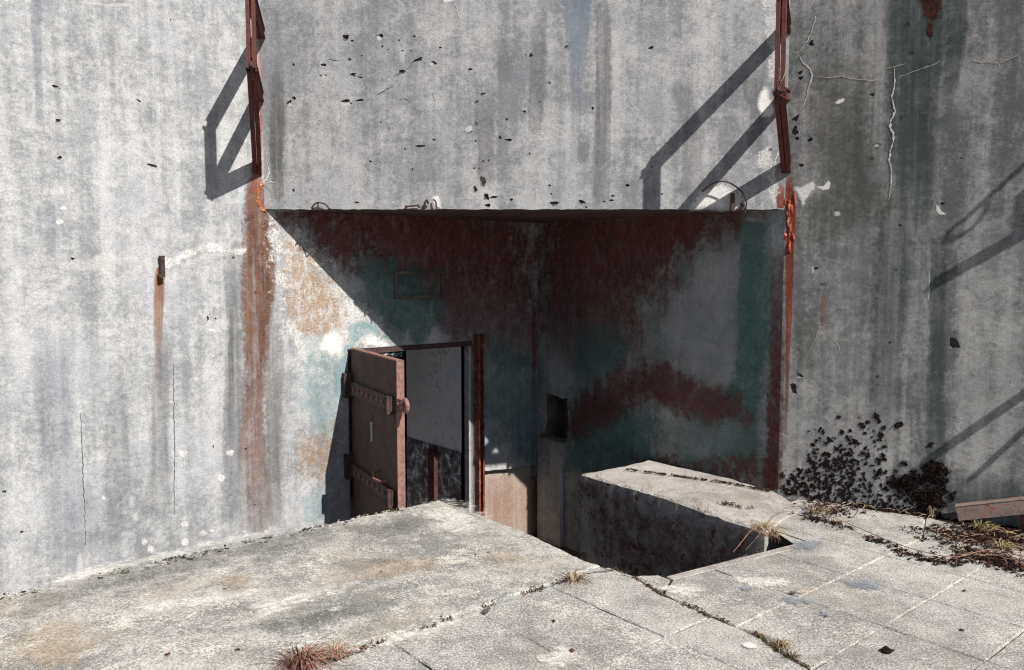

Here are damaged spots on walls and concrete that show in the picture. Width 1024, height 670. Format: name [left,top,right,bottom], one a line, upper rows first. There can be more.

spalling [473,159,513,207]
crack [796,16,939,200]
water stain [888,0,945,187]
rust [154,267,163,320]
rust [242,170,275,480]
rust [776,181,796,381]